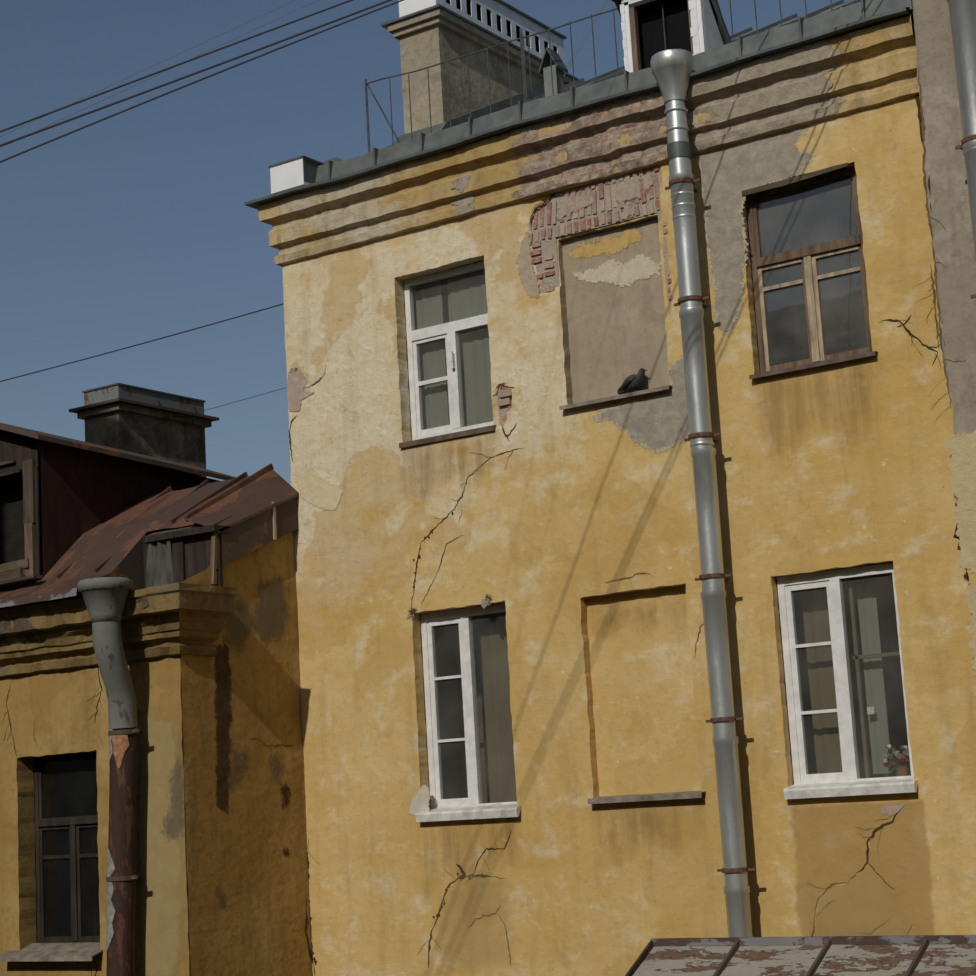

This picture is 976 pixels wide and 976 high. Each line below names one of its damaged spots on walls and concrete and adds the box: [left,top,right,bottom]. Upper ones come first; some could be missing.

spalling [509,89,673,315]
spalling [685,36,846,337]
crack [879,65,966,408]
flaking render [287,365,326,412]
spalling [496,385,517,442]
flaking render [592,355,689,454]
crack [410,448,525,615]
peeling [946,430,976,696]
corrosion [112,734,129,768]
water stain [214,579,287,813]
crack [421,831,511,968]
crack [808,806,912,936]